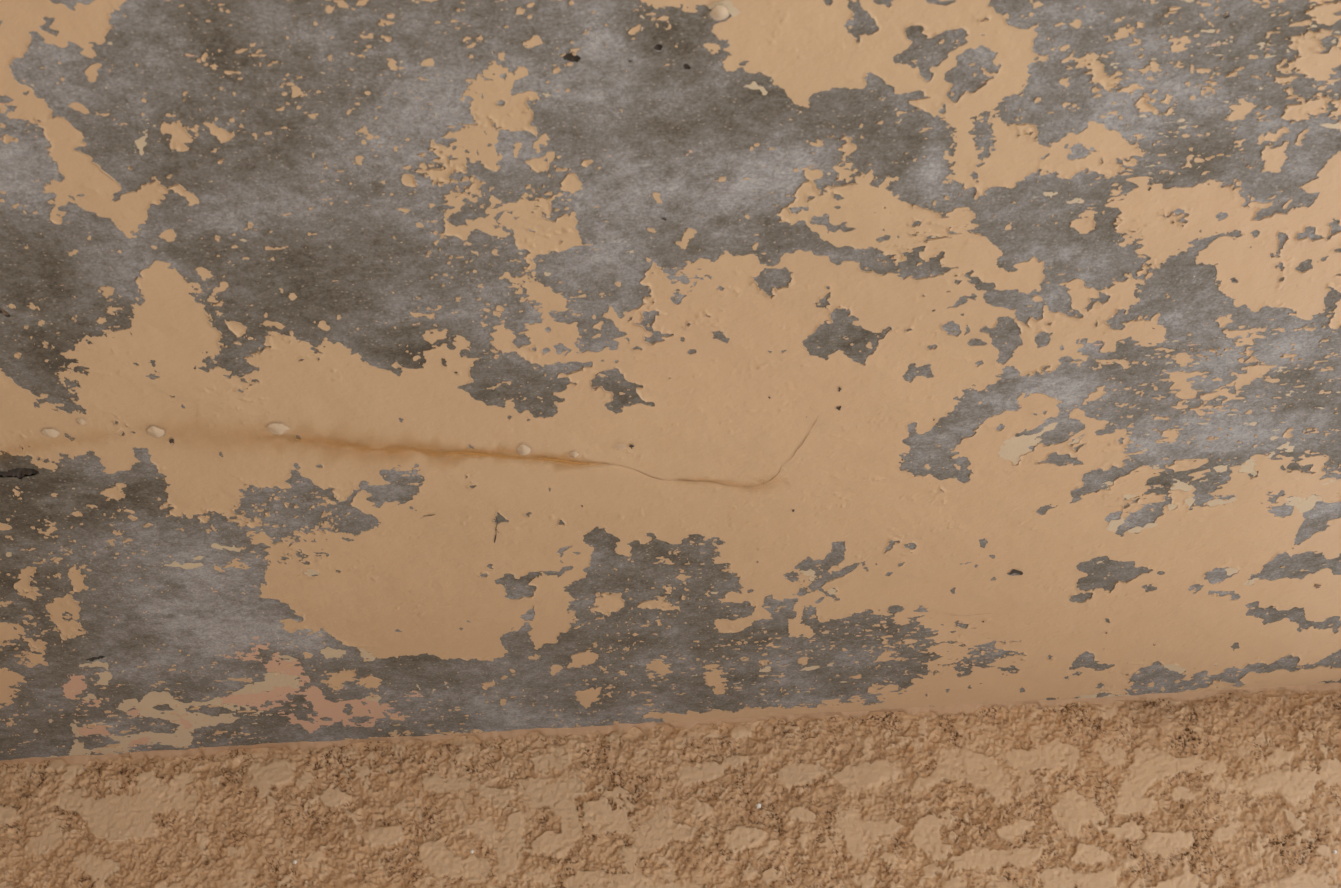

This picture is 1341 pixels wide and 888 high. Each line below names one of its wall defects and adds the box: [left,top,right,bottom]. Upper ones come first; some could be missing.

peeling [0,421,1025,760]
peeling [0,0,1341,633]
crack [587,421,816,488]
peeling [1064,642,1341,699]